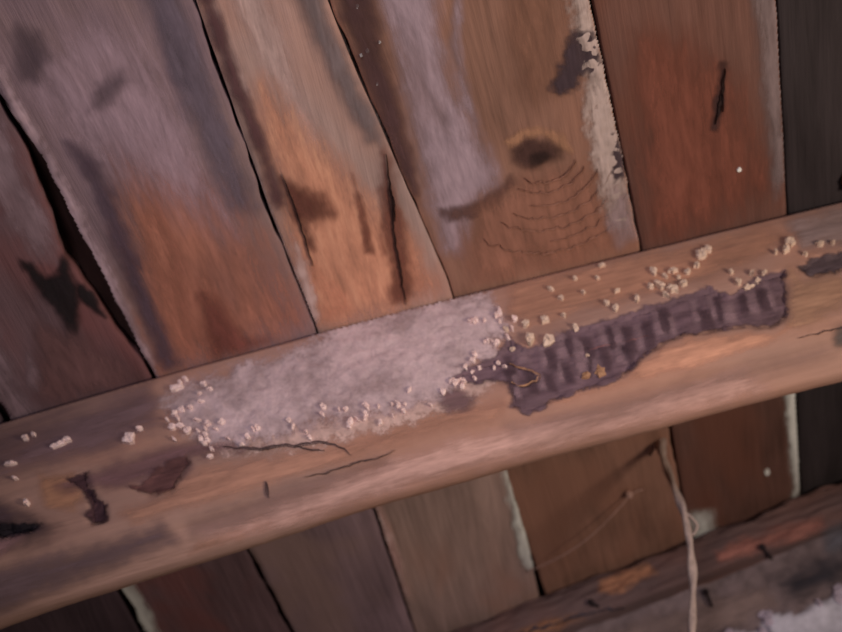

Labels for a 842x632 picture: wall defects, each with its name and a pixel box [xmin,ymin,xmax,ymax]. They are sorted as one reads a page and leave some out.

damp [0,0,300,371]
damp [202,0,632,321]
damp [0,390,156,474]
crack [223,440,393,477]
damp [239,376,760,529]
damp [0,528,167,608]
damp [505,471,533,569]